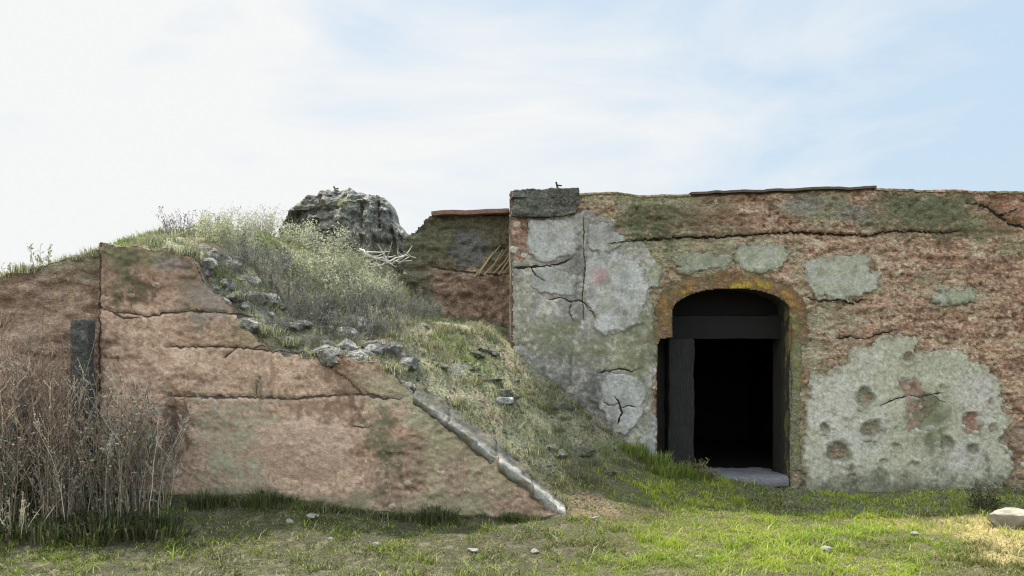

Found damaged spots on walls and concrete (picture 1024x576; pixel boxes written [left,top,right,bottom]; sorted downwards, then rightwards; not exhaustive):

crack [967,203,1024,229]
crack [432,216,960,321]
crack [97,246,260,418]
crack [169,344,402,400]
crack [598,368,640,424]
peeling [798,331,1024,492]
crack [881,392,945,406]